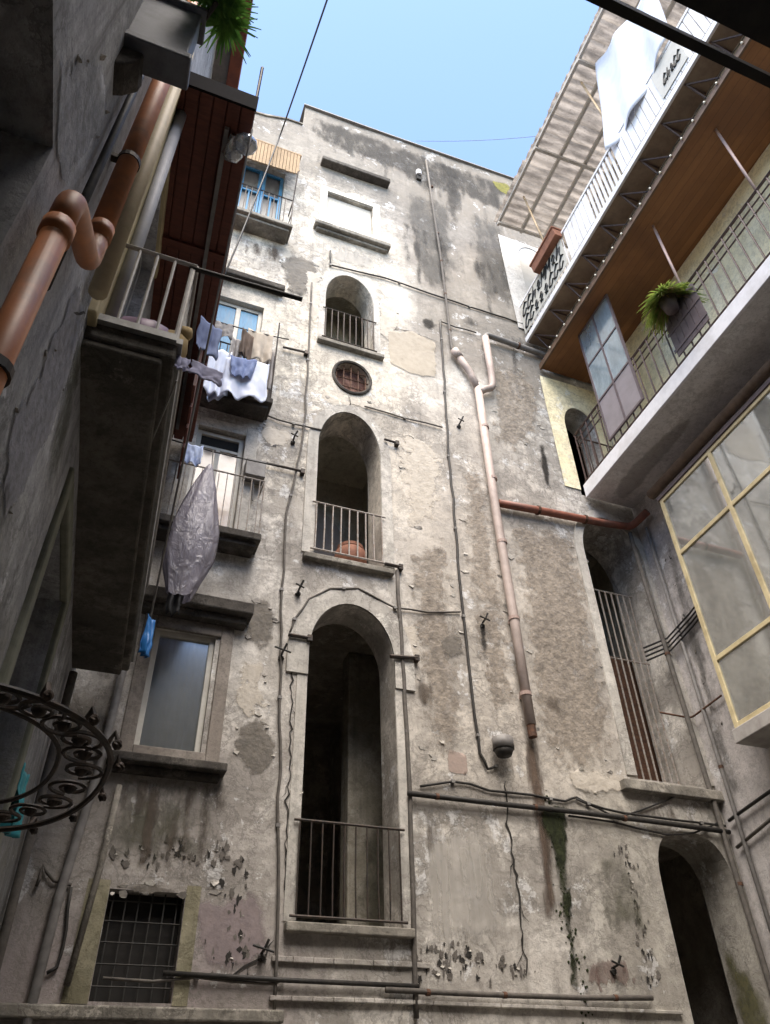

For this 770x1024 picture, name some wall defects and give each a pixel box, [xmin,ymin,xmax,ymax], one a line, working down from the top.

water stain [322,123,502,284]
water stain [475,215,508,297]
water stain [138,782,159,863]
rust [526,740,554,914]
flaking render [97,834,267,973]
flaking render [417,940,536,986]
flaking render [614,844,661,988]